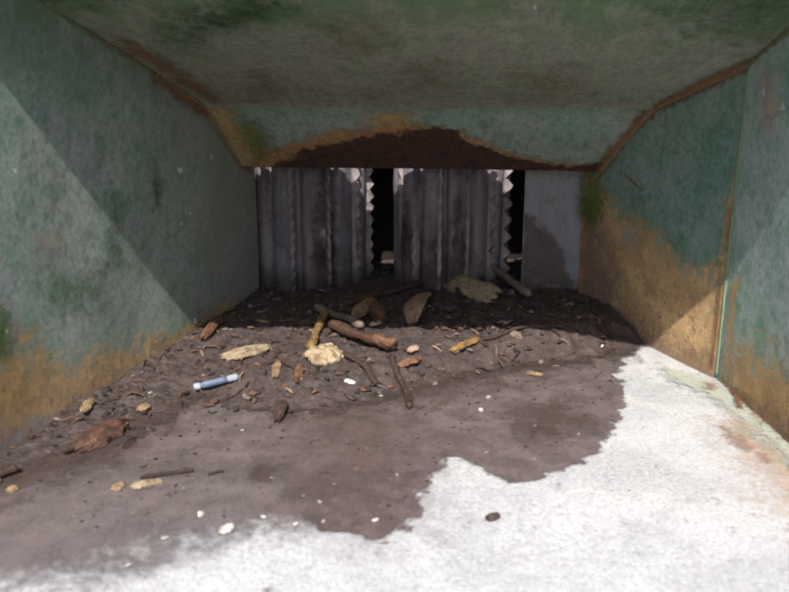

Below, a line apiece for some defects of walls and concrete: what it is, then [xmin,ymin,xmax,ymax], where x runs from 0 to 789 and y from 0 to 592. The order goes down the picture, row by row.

rust [122,40,275,170]
rust [578,60,789,443]
damp [0,348,643,586]